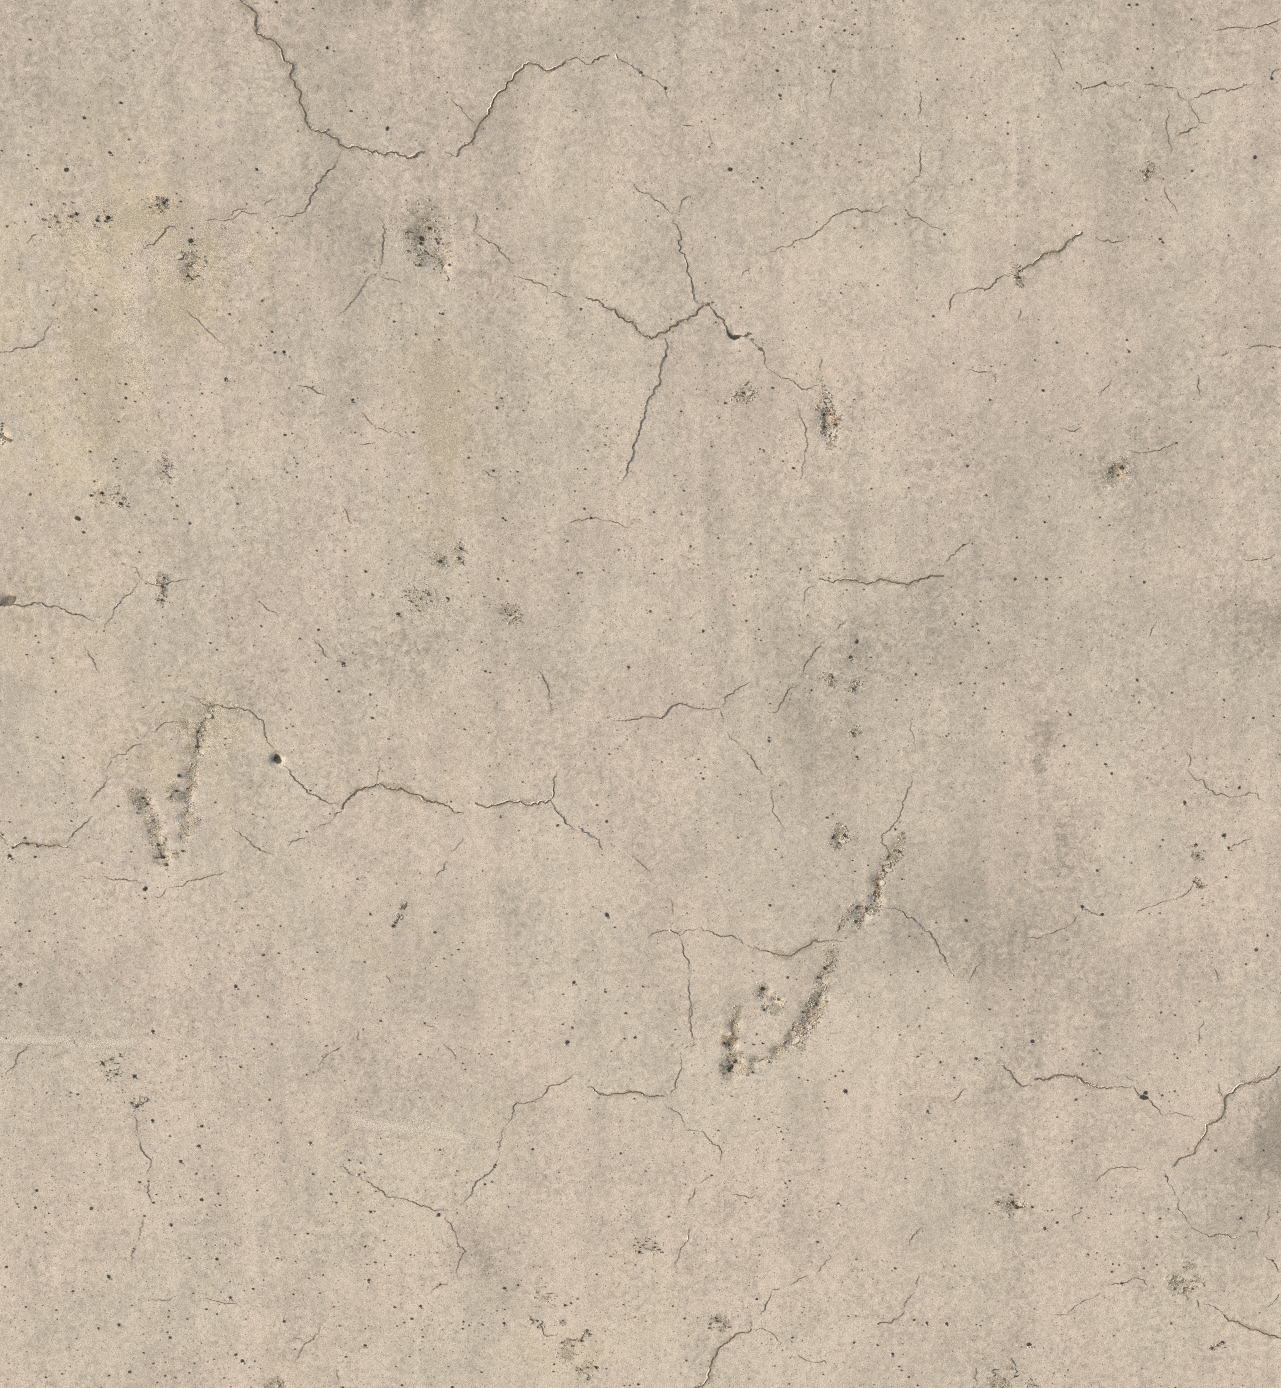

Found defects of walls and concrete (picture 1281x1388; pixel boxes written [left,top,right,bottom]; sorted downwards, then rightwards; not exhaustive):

crack [139,0,667,255]
crack [4,321,53,352]
crack [472,181,822,483]
crack [947,231,1122,320]
crack [0,567,190,670]
crack [0,696,602,898]
crack [892,908,980,981]
crack [341,899,843,1291]
crack [995,1064,1281,1339]